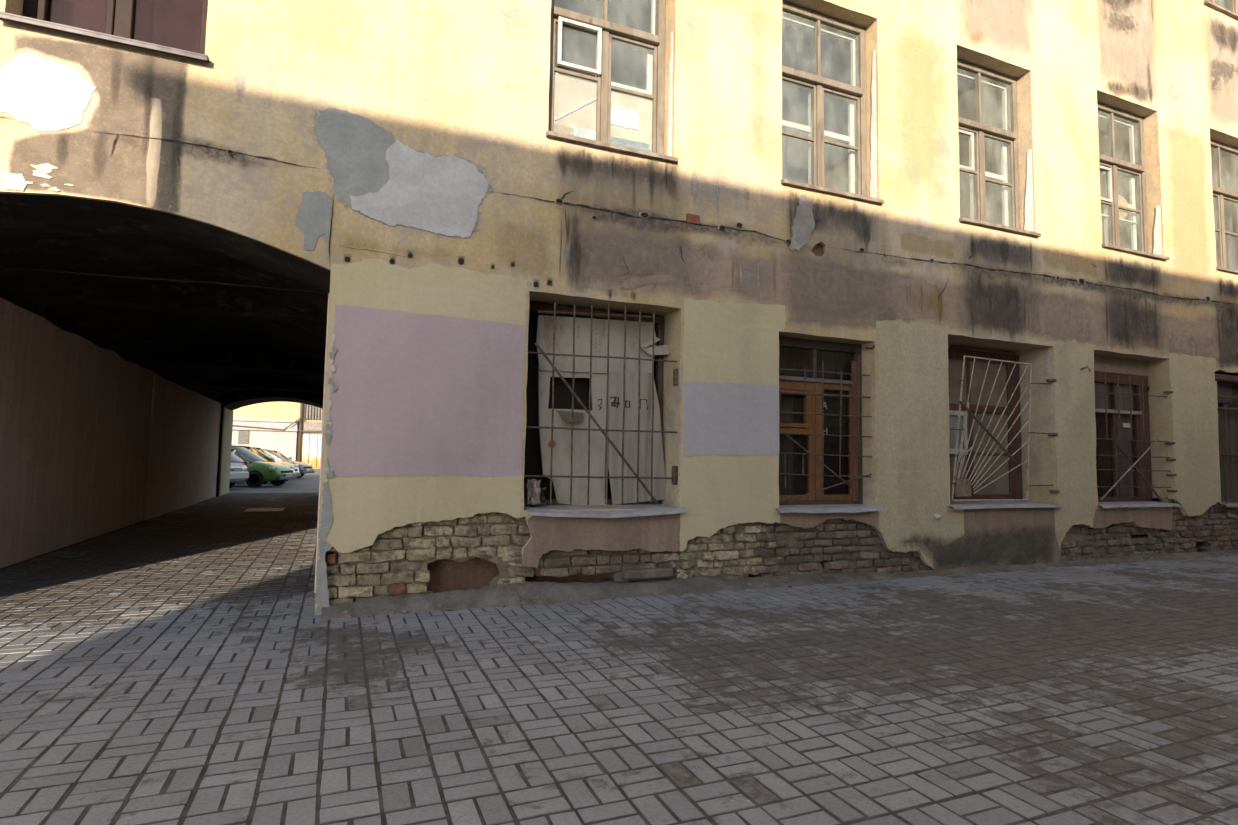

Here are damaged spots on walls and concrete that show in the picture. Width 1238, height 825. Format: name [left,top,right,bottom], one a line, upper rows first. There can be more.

water stain [1105,0,1134,34]
water stain [1110,68,1152,100]
water stain [10,37,187,212]
water stain [563,151,675,196]
water stain [790,197,870,243]
water stain [972,240,1032,265]
water stain [1105,259,1157,287]
water stain [969,279,1025,336]
water stain [1106,298,1158,342]
water stain [1219,281,1238,365]
spalling [320,334,932,604]
spalling [1060,496,1238,561]